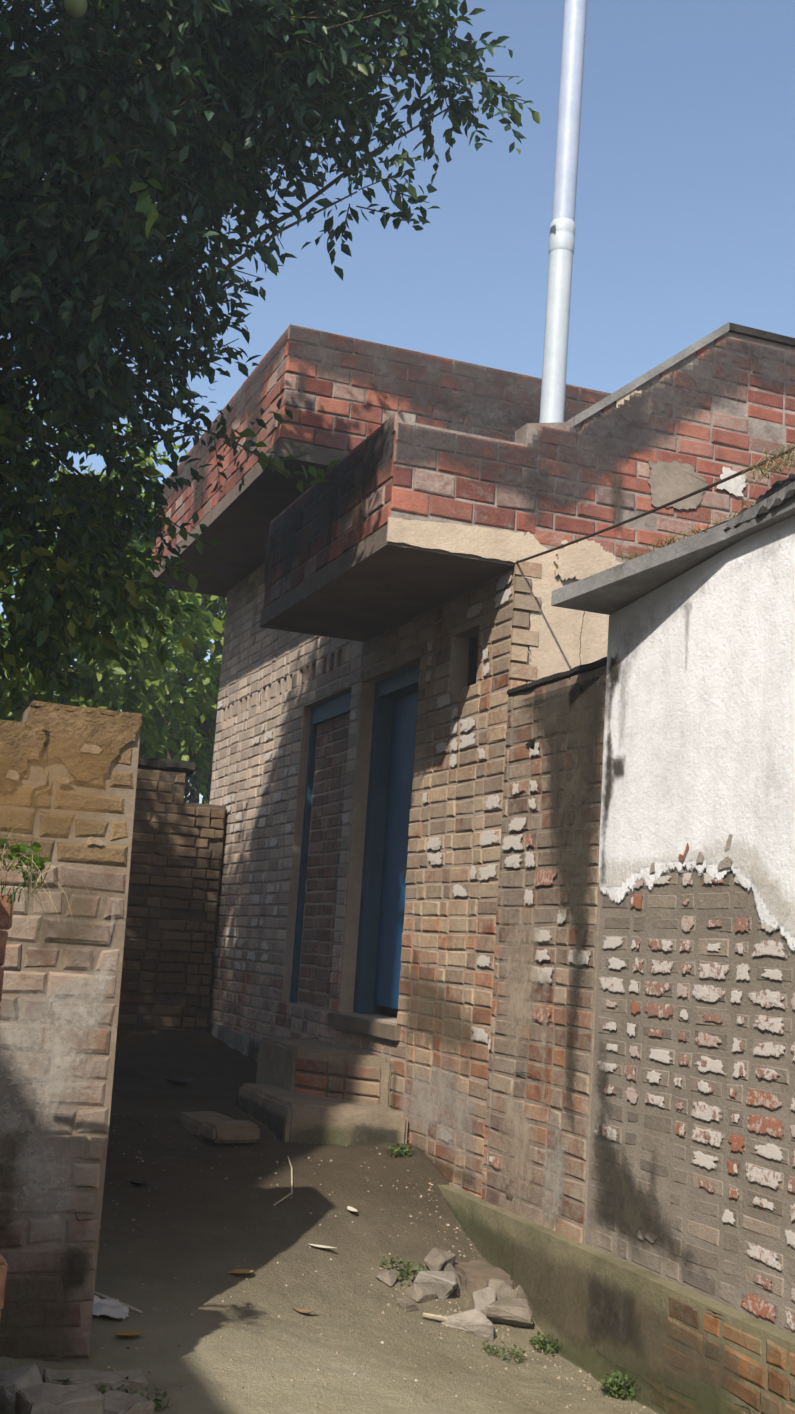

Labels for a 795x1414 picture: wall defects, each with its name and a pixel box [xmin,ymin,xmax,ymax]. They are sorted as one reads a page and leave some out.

spalling [553,539,621,581]
peeling [465,571,512,619]
peeling [482,648,490,676]
peeling [436,693,485,767]
peeling [525,737,539,756]
crack [29,729,54,814]
peeling [426,837,442,865]
peeling [452,780,795,1331]
water stain [486,1234,740,1414]